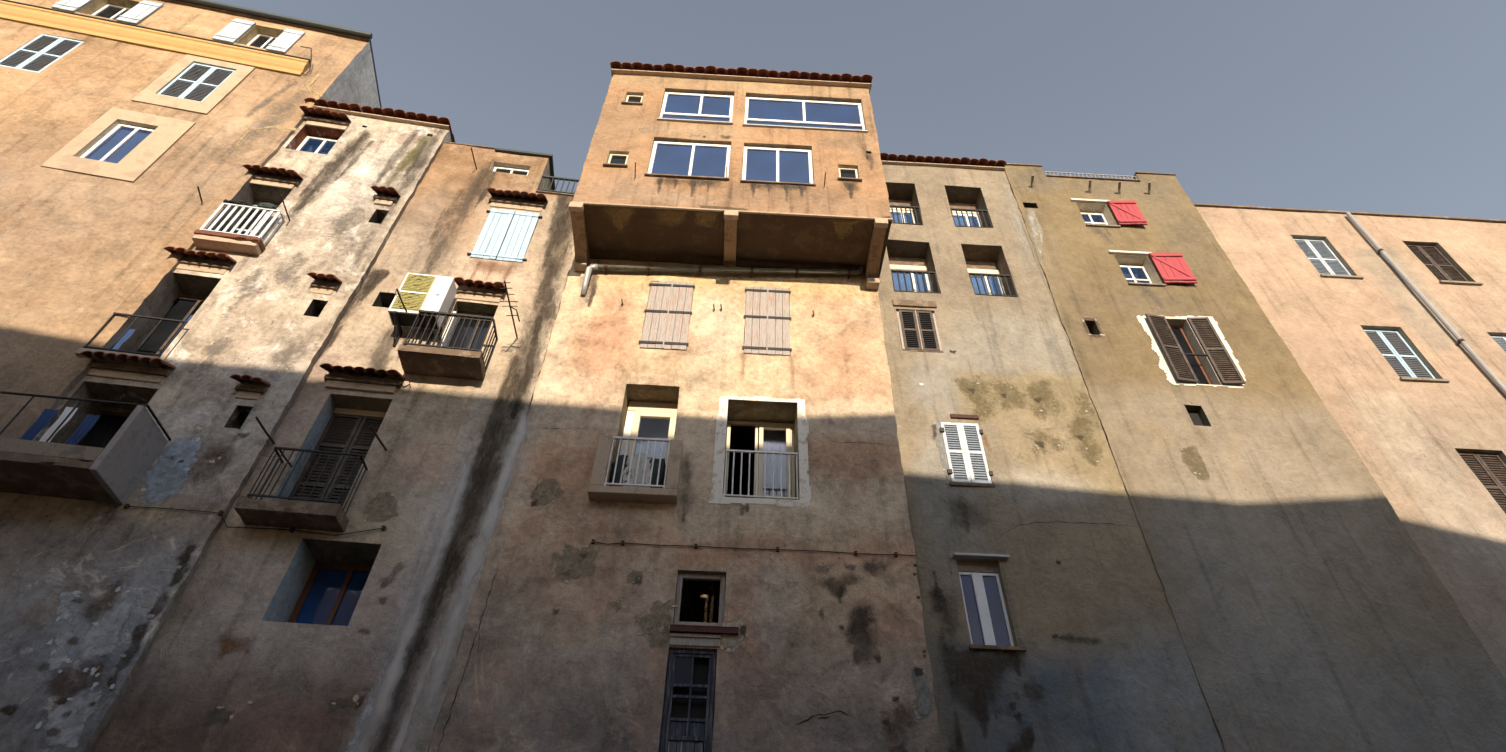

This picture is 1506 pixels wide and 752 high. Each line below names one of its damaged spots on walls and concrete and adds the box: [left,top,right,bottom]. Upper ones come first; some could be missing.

leakage [377,130,434,198]
peeling [140,437,202,503]
leakage [346,195,574,752]
peeling [35,544,196,748]
leakage [823,562,886,664]
leakage [933,571,1041,752]